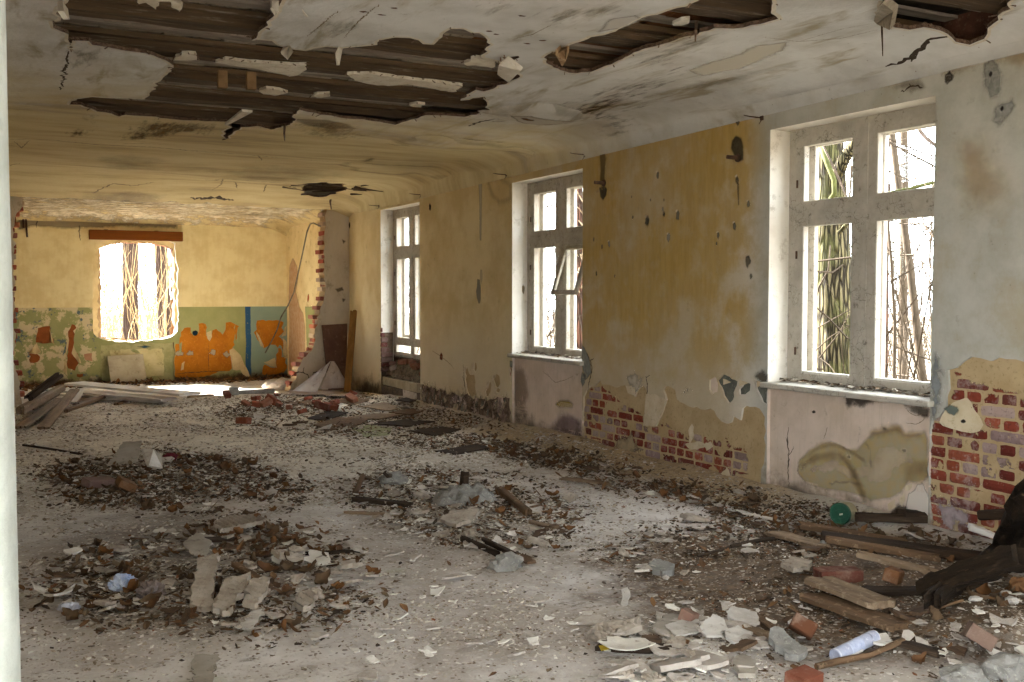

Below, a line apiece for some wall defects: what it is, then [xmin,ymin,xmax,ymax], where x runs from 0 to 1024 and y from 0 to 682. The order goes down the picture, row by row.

crack [59,51,69,90]
spalling [53,11,174,71]
spalling [544,3,786,75]
crack [885,36,947,92]
spalling [893,0,1010,45]
spalling [70,75,520,139]
peeling [20,183,347,228]
peeling [29,324,92,377]
peeling [110,259,309,378]
flaking render [584,375,767,482]
damp [789,427,927,499]
flaking render [888,357,1024,540]